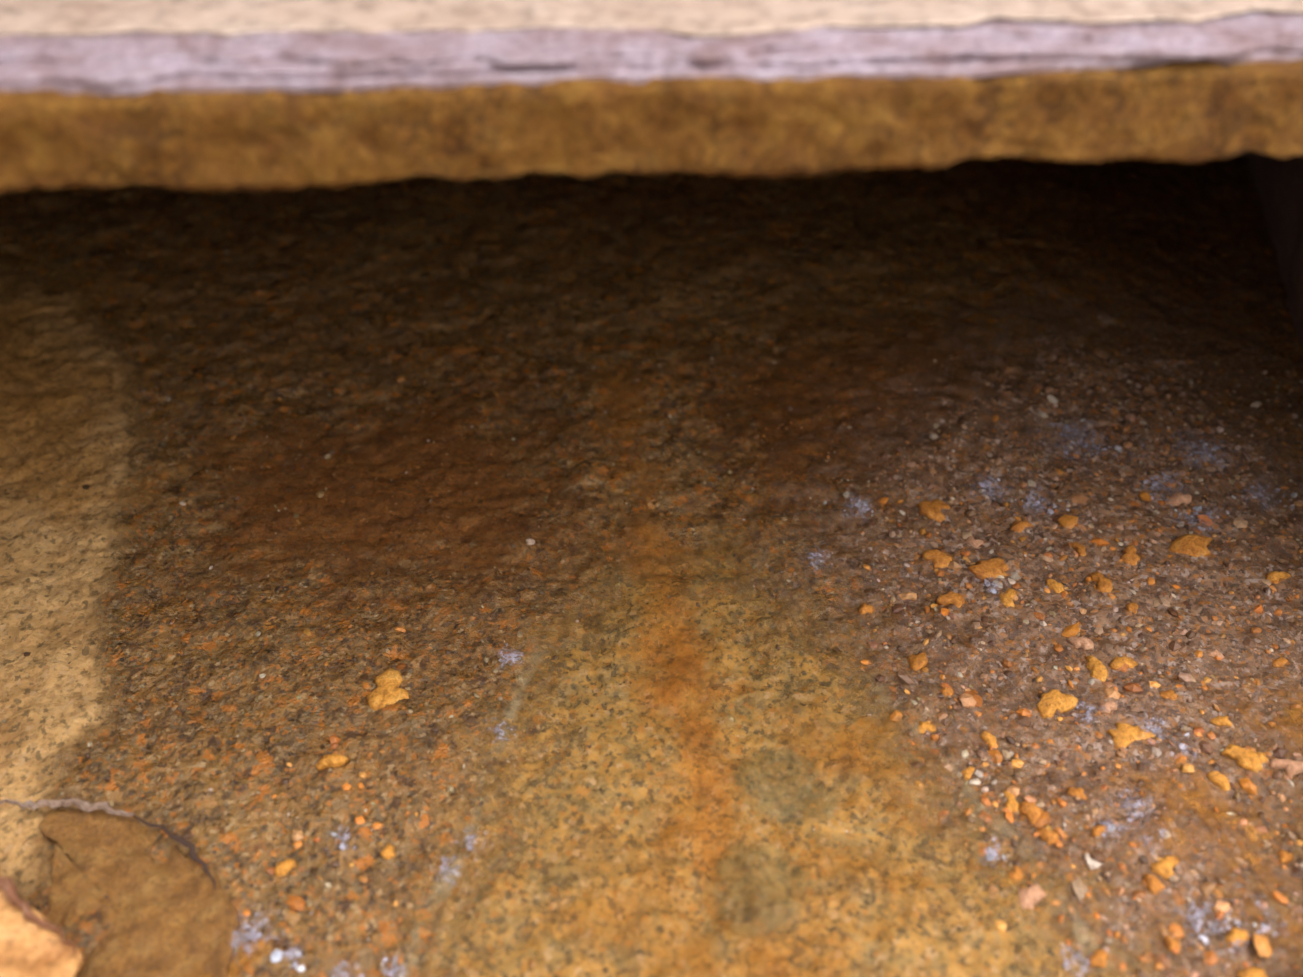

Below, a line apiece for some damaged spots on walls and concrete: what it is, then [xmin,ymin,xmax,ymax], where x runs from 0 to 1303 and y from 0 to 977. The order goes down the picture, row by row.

water stain [841,495,877,519]
water stain [970,474,1069,519]
water stain [1129,432,1303,532]
water stain [1133,716,1196,758]
water stain [1098,788,1146,843]
water stain [1179,902,1278,952]